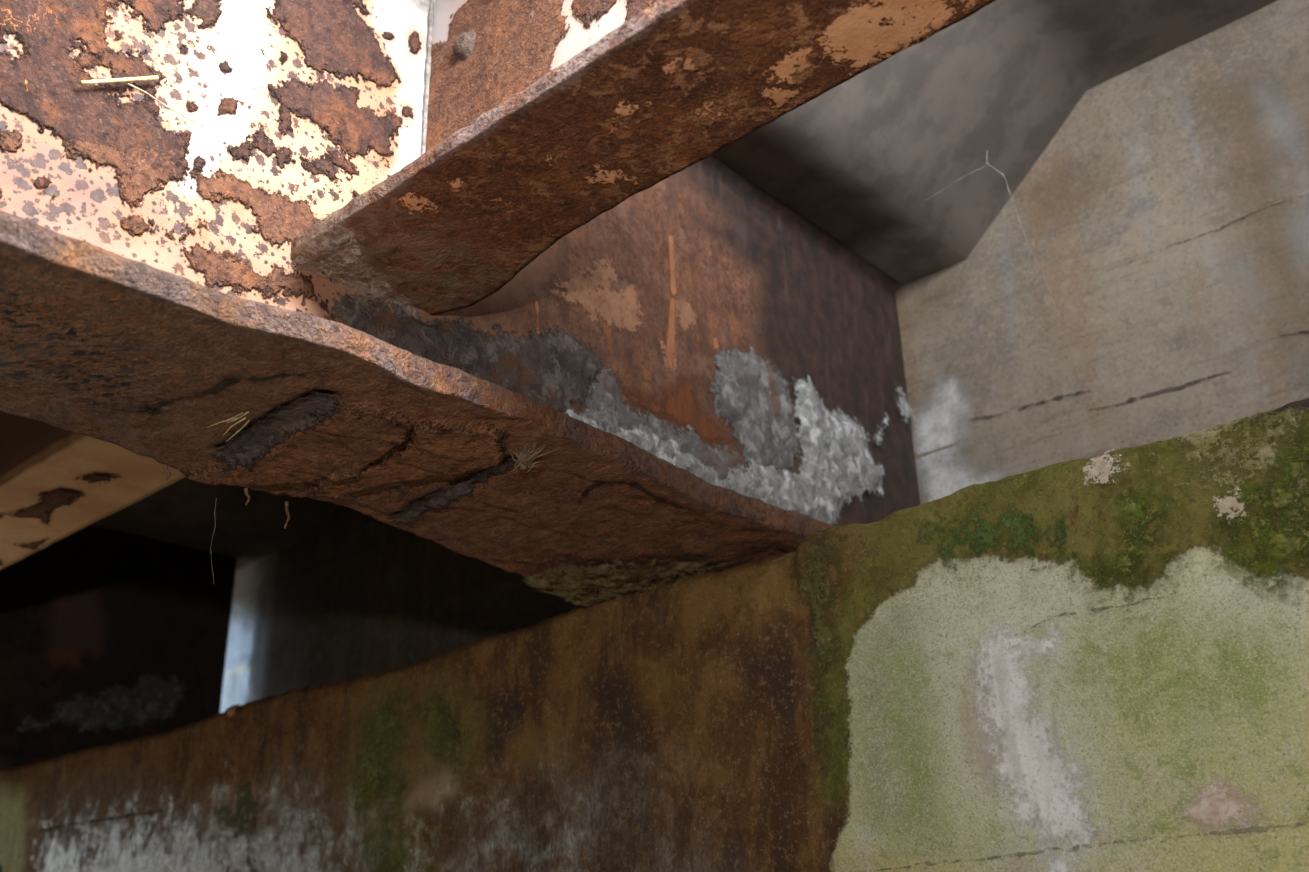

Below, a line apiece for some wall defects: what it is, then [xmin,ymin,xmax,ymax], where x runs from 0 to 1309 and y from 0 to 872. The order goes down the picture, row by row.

peeling [661,57,703,77]
peeling [761,0,981,115]
peeling [606,101,652,134]
corrosion [0,0,658,302]
crack [1129,201,1285,263]
corrosion [622,235,726,444]
crack [1272,330,1309,339]
crack [968,372,1231,421]
corrosion [0,472,122,550]
leakage [0,346,1309,872]
crack [881,821,1306,871]